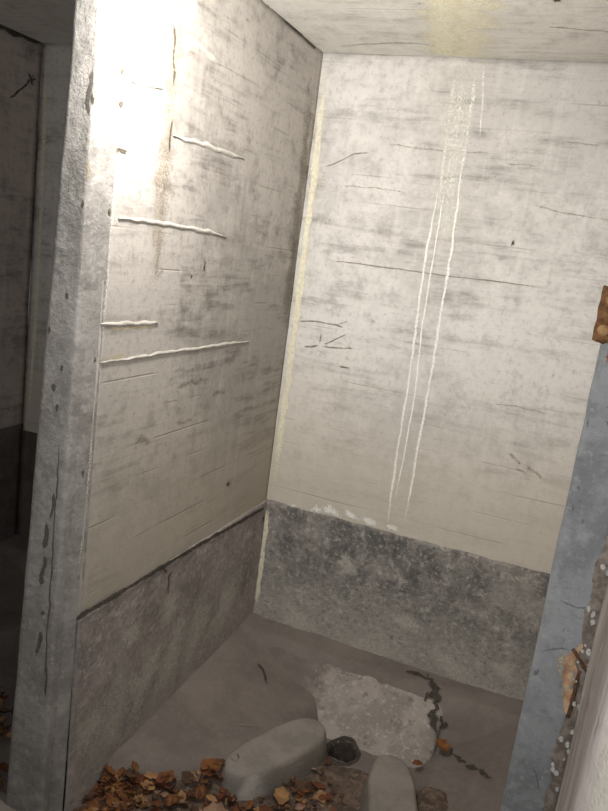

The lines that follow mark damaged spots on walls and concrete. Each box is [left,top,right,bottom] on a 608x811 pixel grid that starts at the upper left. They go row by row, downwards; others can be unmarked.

damp [387,0,512,536]
crack [406,671,492,778]
spalling [544,536,608,811]